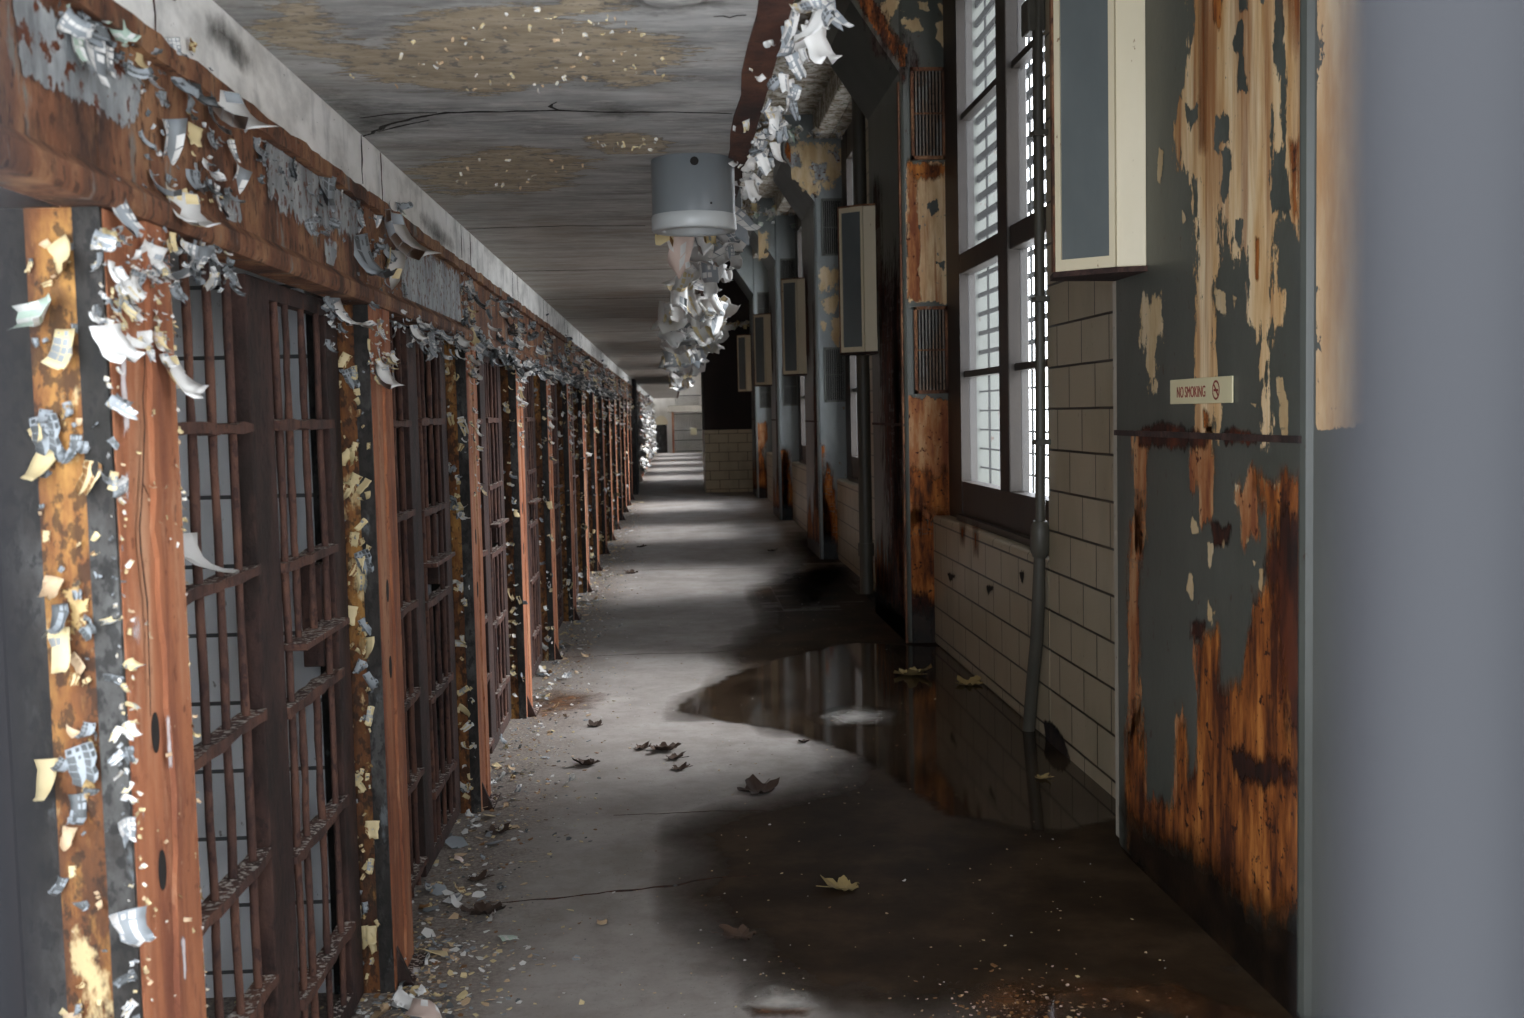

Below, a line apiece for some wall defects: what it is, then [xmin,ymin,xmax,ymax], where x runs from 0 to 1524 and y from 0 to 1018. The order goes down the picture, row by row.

peeling [884,0,943,46]
peeling [12,0,709,1018]
peeling [651,0,854,392]
leakage [725,534,940,670]
corrosion [873,161,950,643]
peeling [1138,287,1164,395]
peeling [1186,516,1225,626]
peeling [1157,0,1328,453]
leakage [667,752,1300,1018]